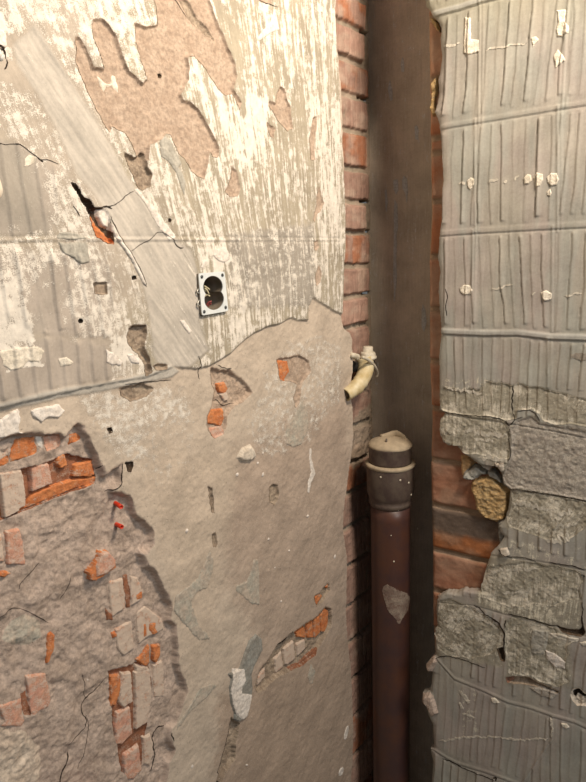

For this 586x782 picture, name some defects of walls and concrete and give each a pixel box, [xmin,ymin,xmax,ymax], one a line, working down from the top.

crack [0,143,58,164]
spalling [75,0,242,240]
crack [101,191,184,287]
spalling [106,324,168,402]
spalling [206,367,253,439]
spalling [276,354,311,407]
peeling [439,379,586,543]
spalling [0,423,188,782]
spalling [254,583,332,693]
peeling [434,562,586,706]
crack [59,674,102,782]
crack [149,725,174,772]